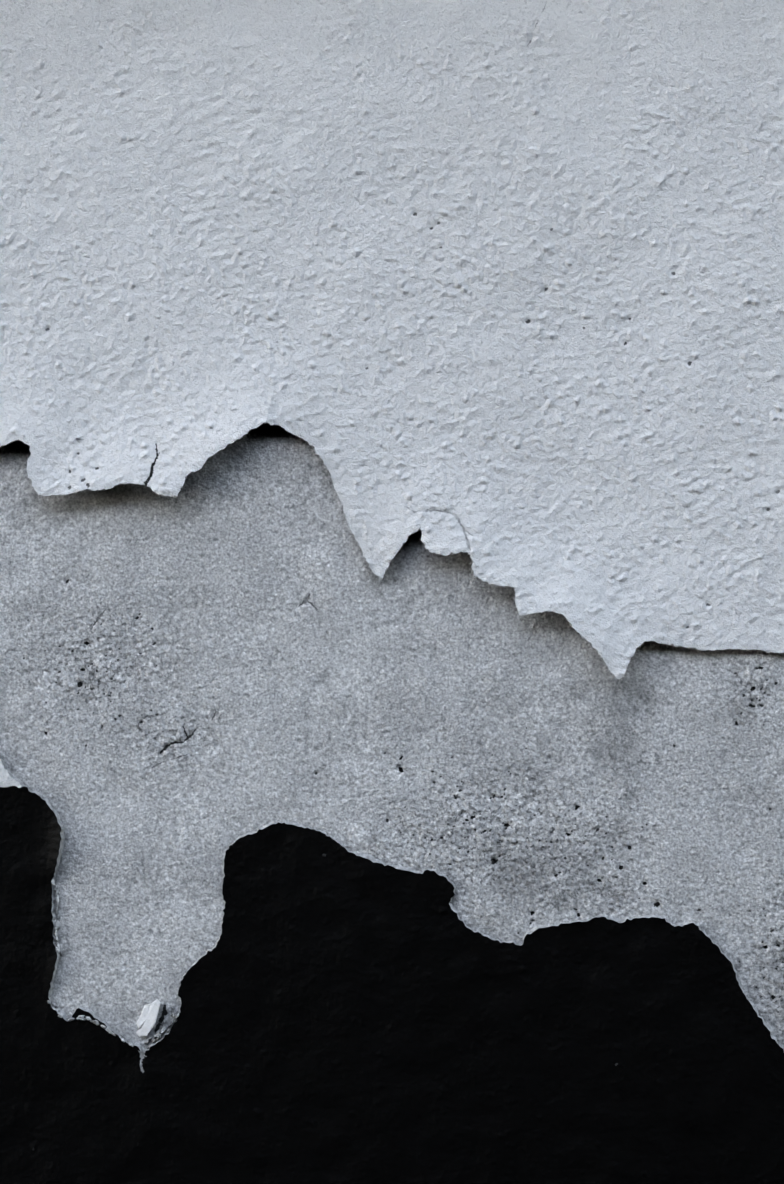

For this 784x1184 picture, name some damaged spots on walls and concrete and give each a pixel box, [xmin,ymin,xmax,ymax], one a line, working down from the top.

crack [144,444,160,486]
peeling [0,423,784,1053]